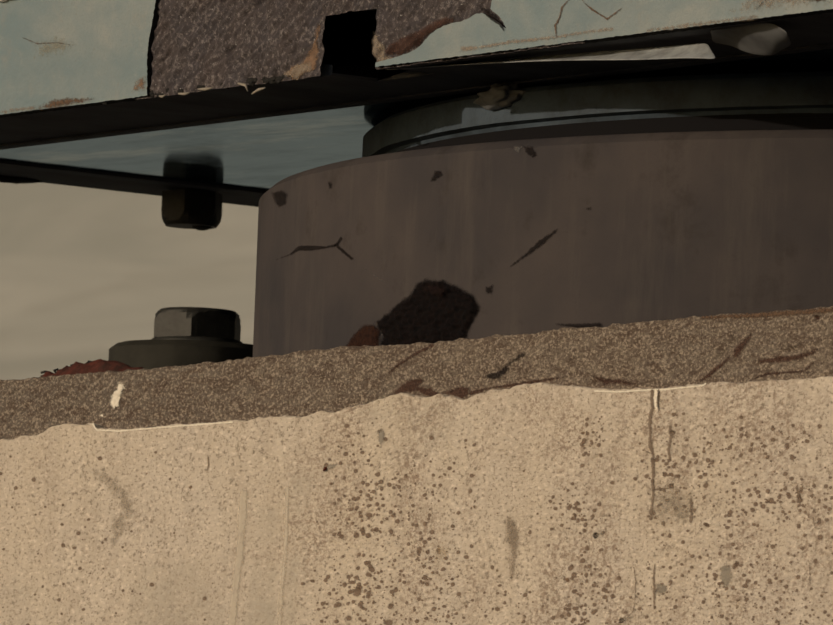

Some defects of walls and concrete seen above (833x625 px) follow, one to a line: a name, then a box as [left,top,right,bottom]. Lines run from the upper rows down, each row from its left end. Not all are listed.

peeling [134,0,791,100]
crack [554,1,619,34]
crack [646,389,674,520]
crack [687,498,695,523]